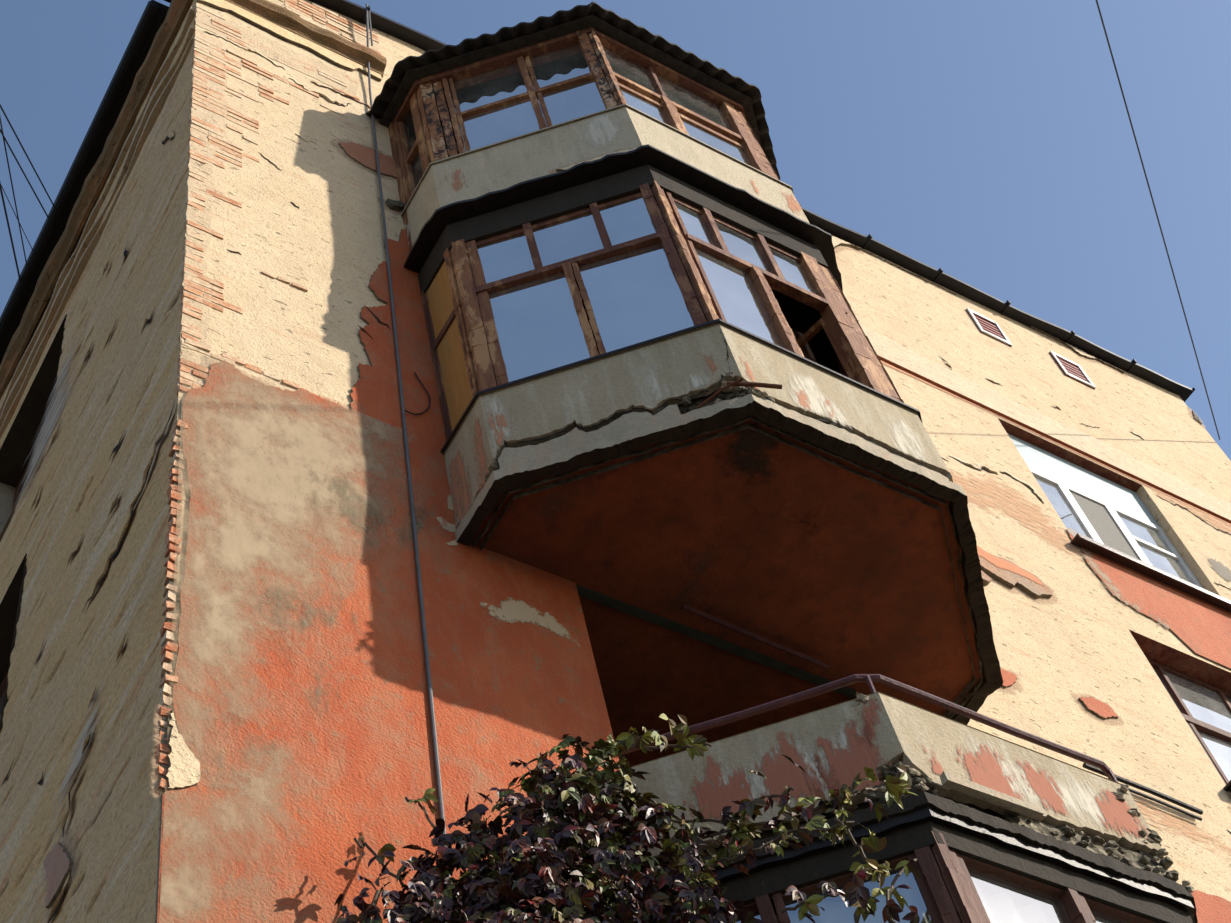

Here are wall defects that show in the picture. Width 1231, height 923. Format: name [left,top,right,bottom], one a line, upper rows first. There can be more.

crack [203,6,351,107]
spalling [176,5,371,410]
flaking render [332,140,397,180]
crack [504,331,730,444]
crack [776,403,1044,503]
flaking render [949,469,1171,629]
spalling [153,420,201,800]
peeling [481,597,579,646]
flaking render [999,667,1022,693]
flaking render [1072,694,1123,724]
spalling [866,761,940,806]
spalling [1003,783,1231,893]